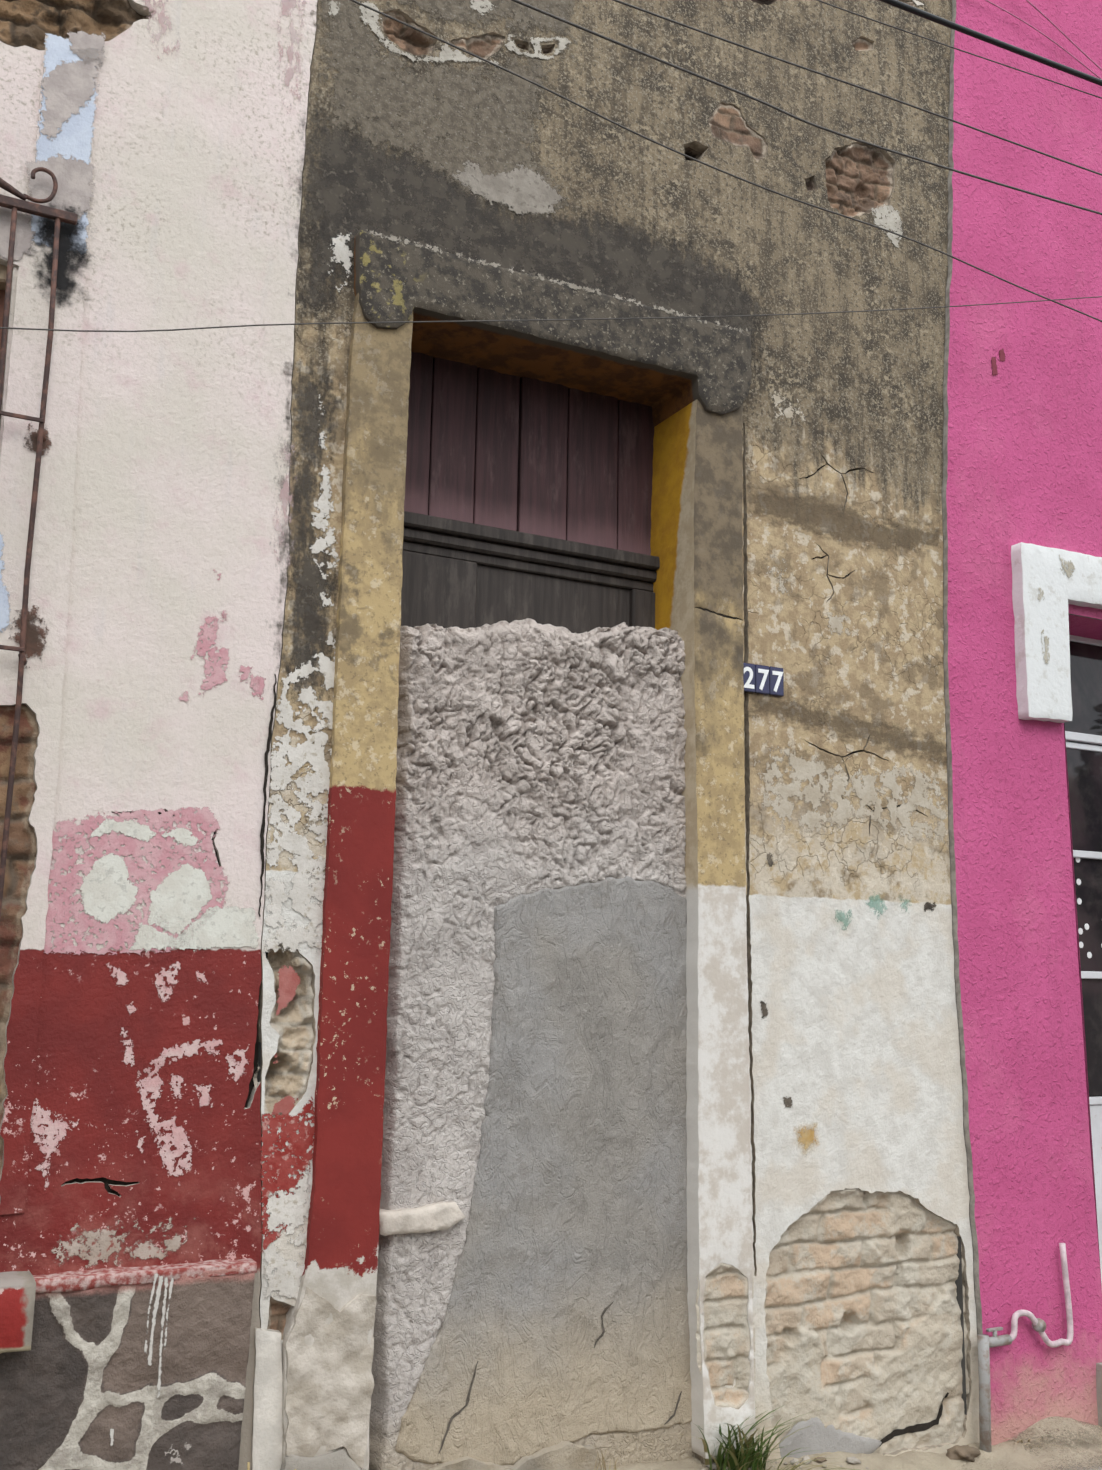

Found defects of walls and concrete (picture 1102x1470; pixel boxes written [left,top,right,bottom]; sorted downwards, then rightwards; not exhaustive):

peeling [359,0,571,69]
peeling [0,0,152,261]
spalling [684,147,702,161]
spalling [805,143,903,250]
peeling [327,233,353,292]
peeling [310,394,340,607]
peeling [0,610,377,1469]
crack [62,1177,138,1196]
crack [594,1301,614,1348]
flaking render [695,1188,970,1454]
crack [438,1361,478,1454]
crack [664,1391,682,1425]